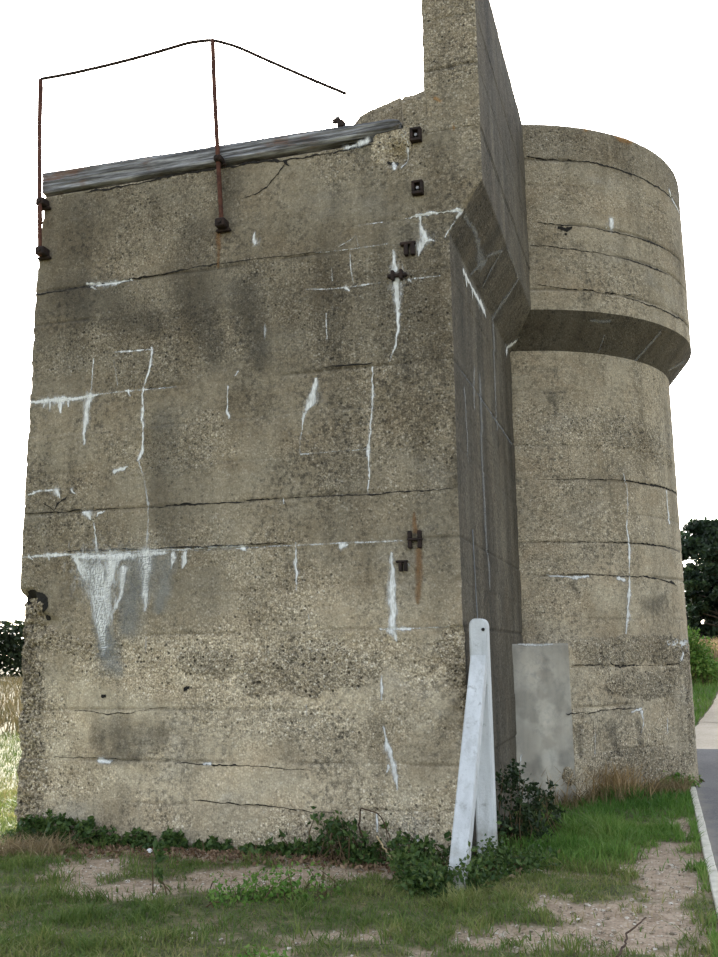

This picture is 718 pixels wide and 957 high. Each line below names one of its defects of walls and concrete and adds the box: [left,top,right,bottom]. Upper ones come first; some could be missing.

crack [86,144,372,199]
leakage [392,251,416,352]
leakage [29,358,98,444]
leakage [113,347,160,473]
leakage [301,378,317,434]
leakage [28,511,252,653]
leakage [332,540,412,641]
spalling [15,590,102,826]
crack [75,707,166,715]
crack [53,754,140,762]
crack [174,762,308,770]
crack [193,800,335,813]